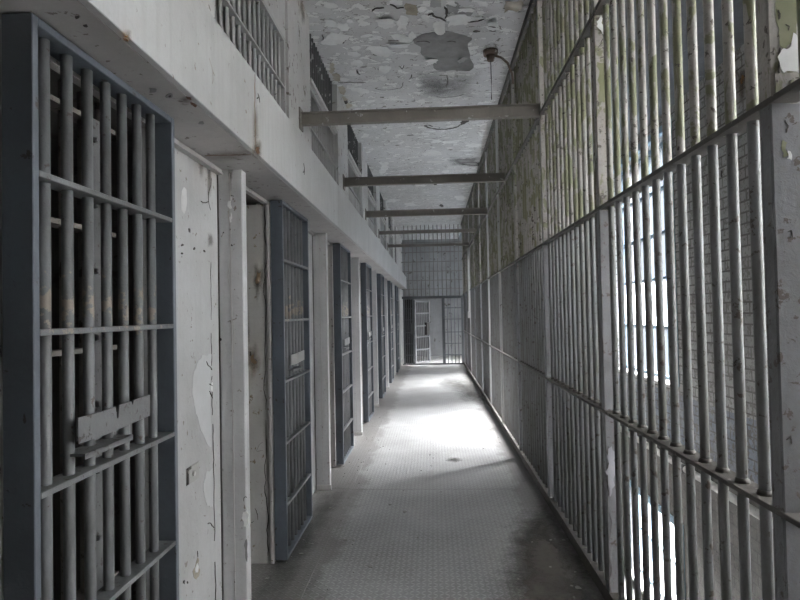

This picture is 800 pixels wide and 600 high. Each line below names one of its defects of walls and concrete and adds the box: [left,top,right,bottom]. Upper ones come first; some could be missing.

peeling [321,0,499,109]
peeling [775,0,799,73]
corrosion [205,83,260,156]
peeling [192,354,213,447]